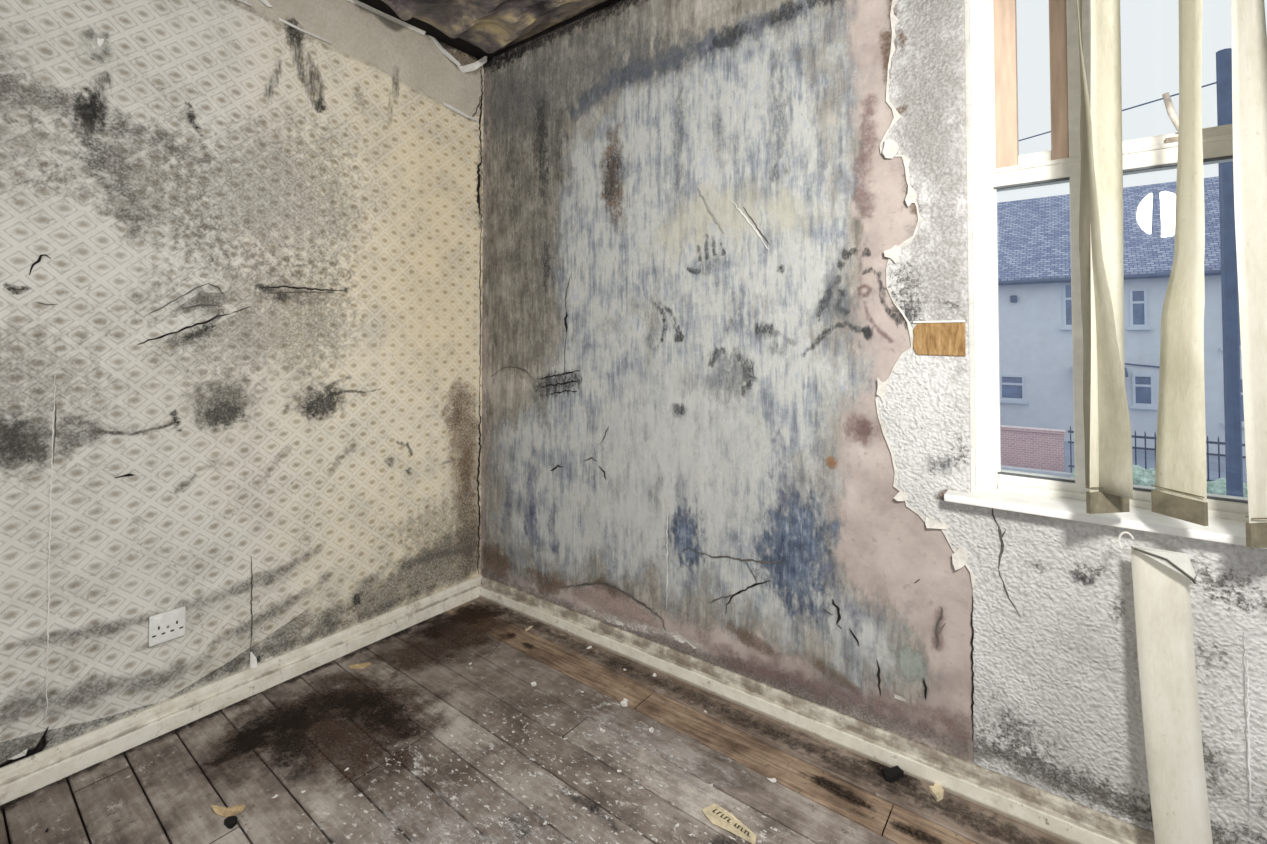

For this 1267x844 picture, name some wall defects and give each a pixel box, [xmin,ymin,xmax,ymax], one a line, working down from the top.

peeling [238,0,332,44]
water stain [233,0,637,116]
water stain [0,74,149,232]
water stain [601,131,622,221]
water stain [888,261,920,323]
peeling [348,0,930,705]
peeling [925,517,951,530]
peeling [952,545,969,570]
crack [992,508,1020,616]
water stain [1190,559,1267,611]
crack [933,595,974,740]
water stain [1210,821,1267,844]